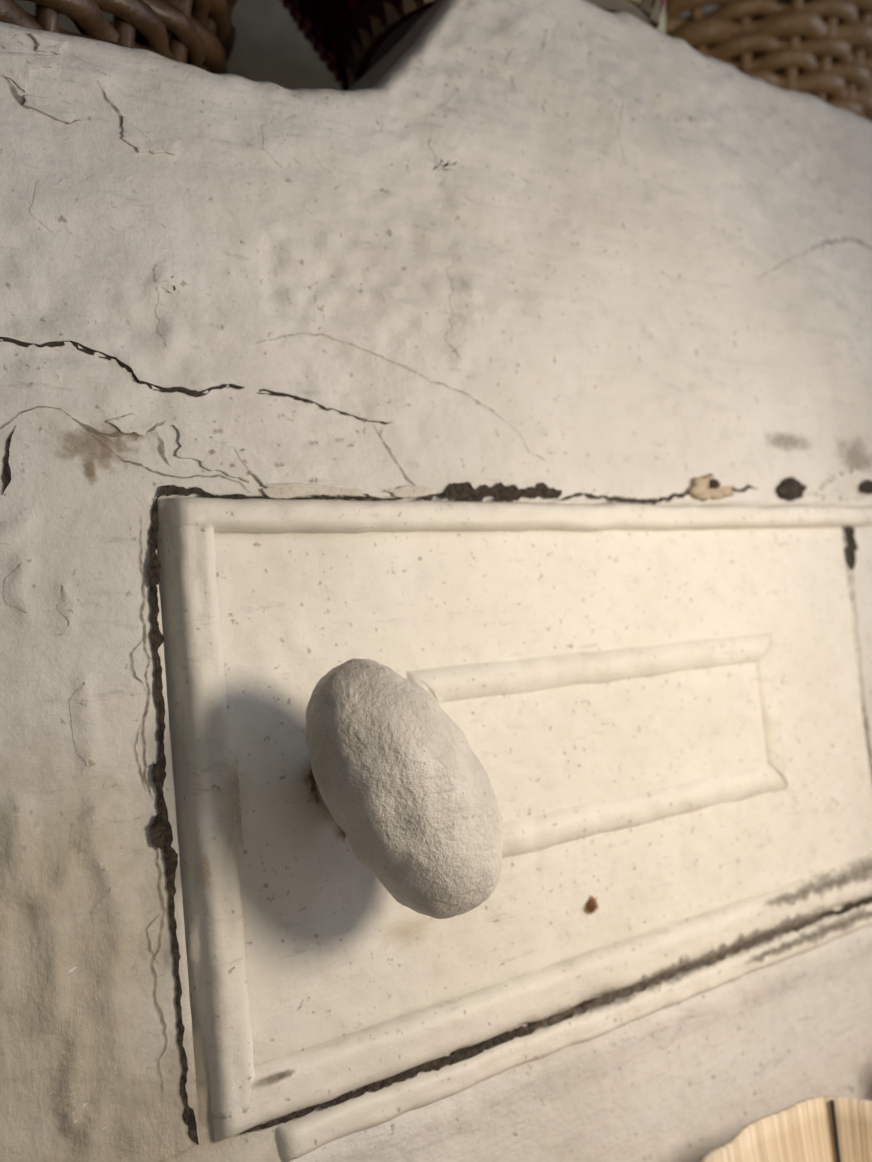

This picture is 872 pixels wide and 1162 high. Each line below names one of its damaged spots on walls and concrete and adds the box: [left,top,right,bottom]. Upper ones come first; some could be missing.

crack [4,77,28,109]
crack [98,81,123,125]
crack [0,337,416,495]
crack [130,515,153,800]
crack [146,848,168,1102]